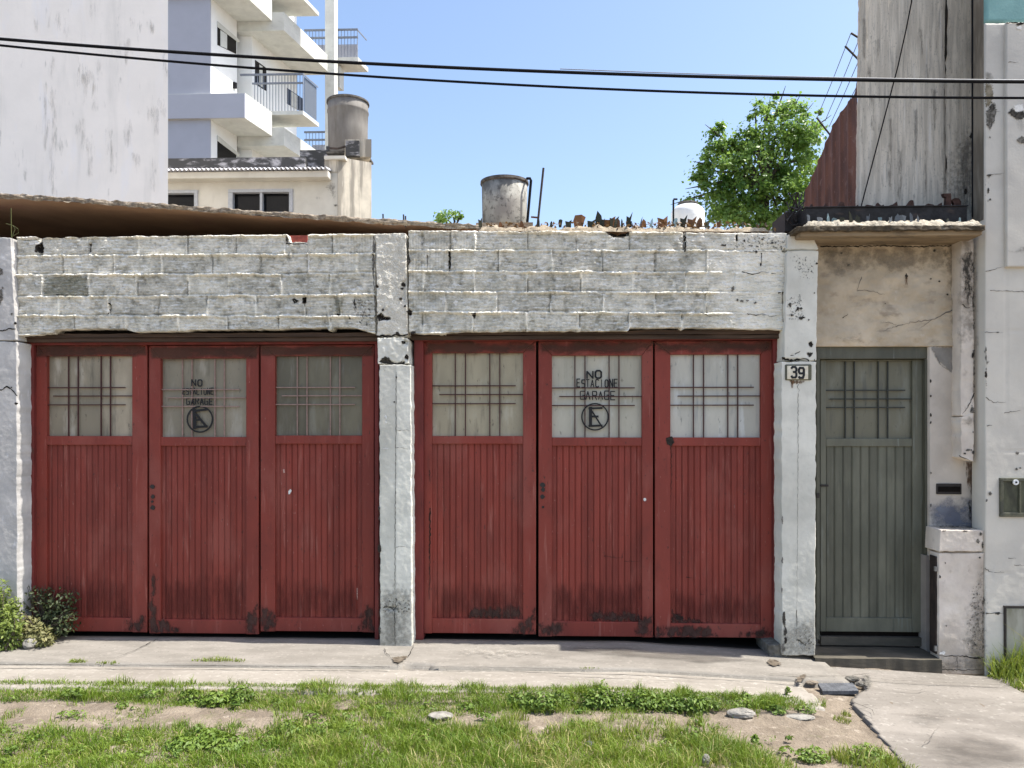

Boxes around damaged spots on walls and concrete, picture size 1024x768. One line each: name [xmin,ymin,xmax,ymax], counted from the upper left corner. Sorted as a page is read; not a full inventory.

peeling [984,83,1024,138]
damp [934,500,972,528]